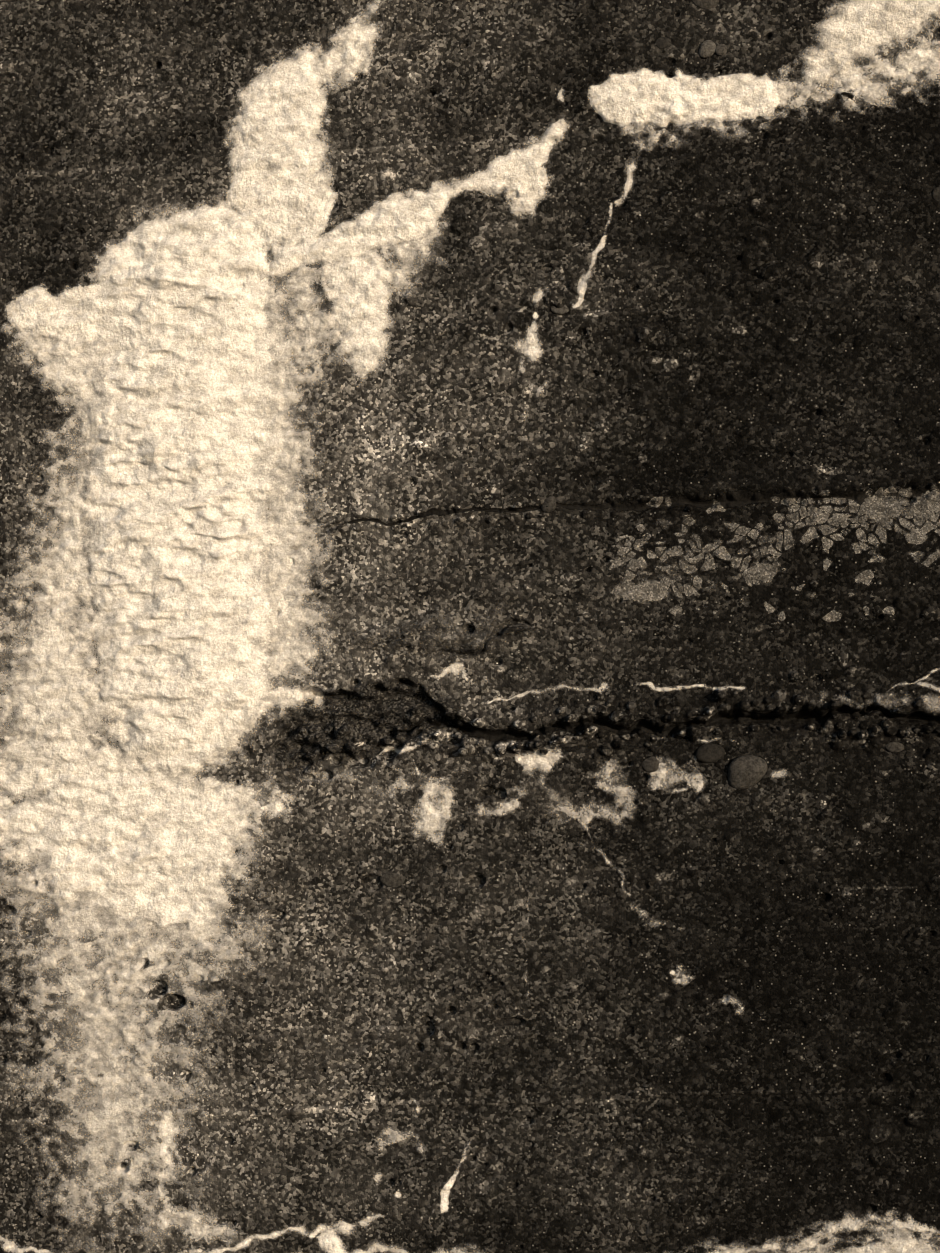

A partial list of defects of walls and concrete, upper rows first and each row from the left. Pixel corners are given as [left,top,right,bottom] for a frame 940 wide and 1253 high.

crack [305,483,940,528]
peeling [608,482,940,628]
crack [396,680,940,755]